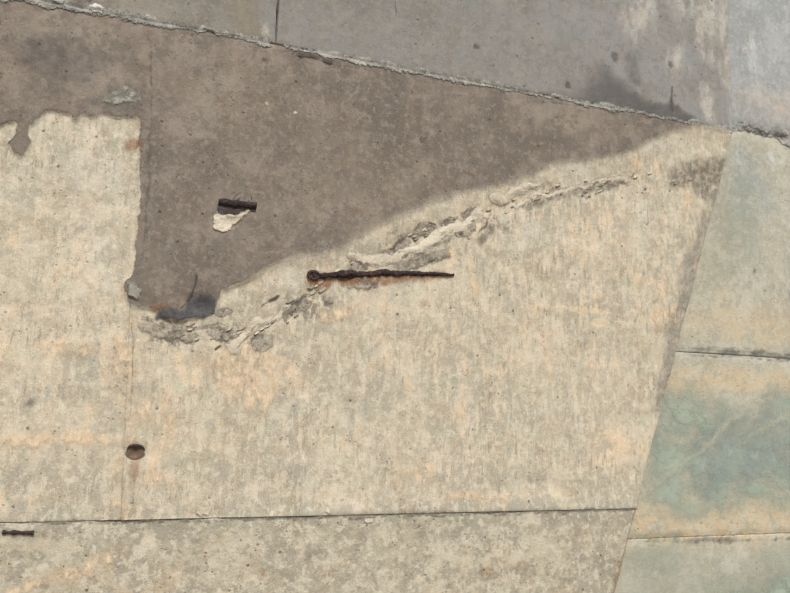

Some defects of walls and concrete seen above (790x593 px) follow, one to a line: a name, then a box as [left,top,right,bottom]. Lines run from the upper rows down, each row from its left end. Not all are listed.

peeling [105,86,140,103]
damp [595,83,697,123]
spalling [0,109,732,523]